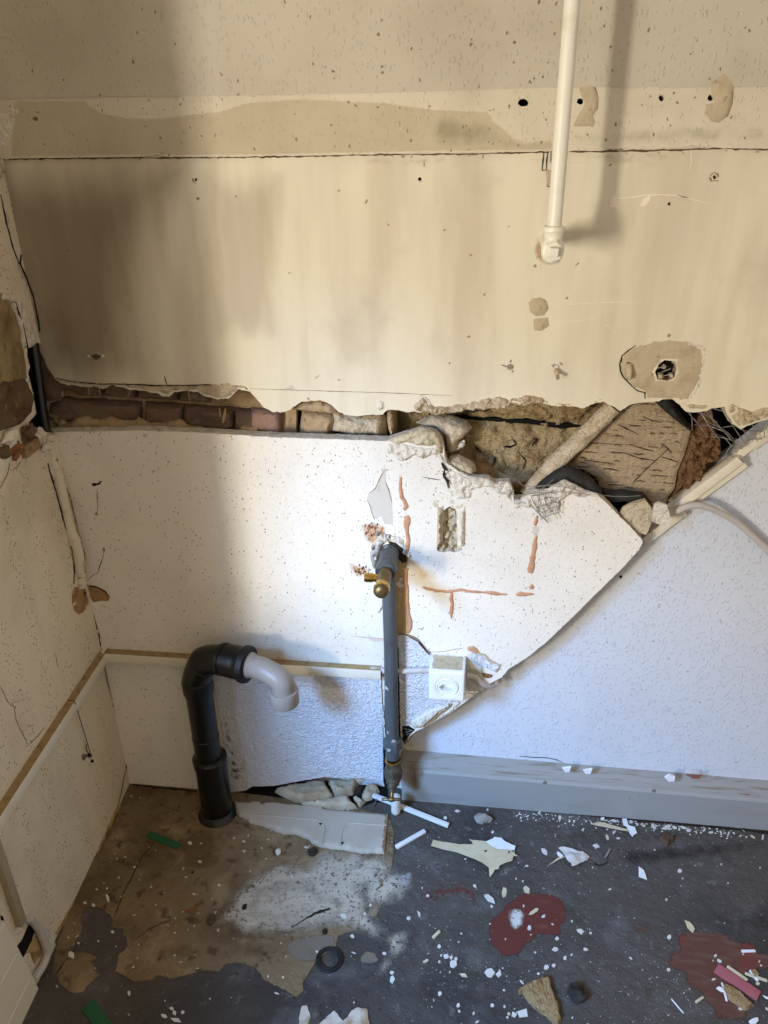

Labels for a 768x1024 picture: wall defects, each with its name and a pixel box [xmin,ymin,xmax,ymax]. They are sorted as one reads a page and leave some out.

peeling [574,85,599,127]
peeling [706,74,734,123]
peeling [529,298,549,331]
spalling [0,293,34,431]
peeling [619,339,708,409]
spalling [721,404,768,426]
spalling [50,379,603,514]
spalling [0,454,23,489]
peeling [620,498,670,535]
spalling [370,531,411,569]
peeling [72,585,110,614]
spalling [238,747,388,810]